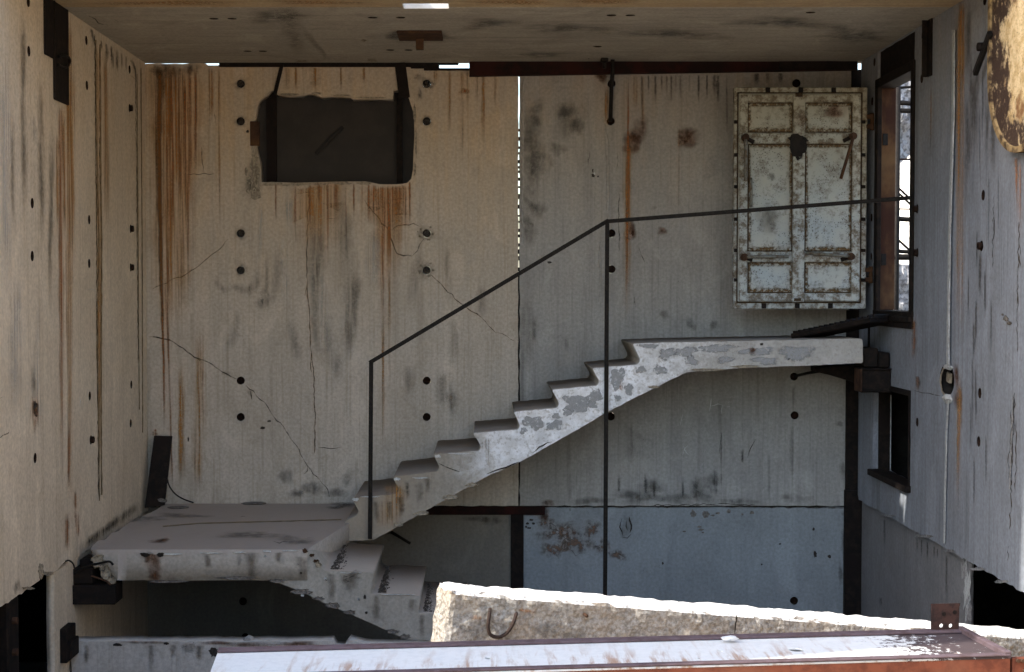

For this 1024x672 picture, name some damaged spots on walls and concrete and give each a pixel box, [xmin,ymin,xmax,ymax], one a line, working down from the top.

corrosion [56,78,74,416]
corrosion [155,66,220,475]
crack [133,68,336,490]
spalling [245,146,372,200]
corrosion [368,183,411,274]
crack [432,276,512,340]
corrosion [625,95,644,264]
peeling [520,343,815,434]